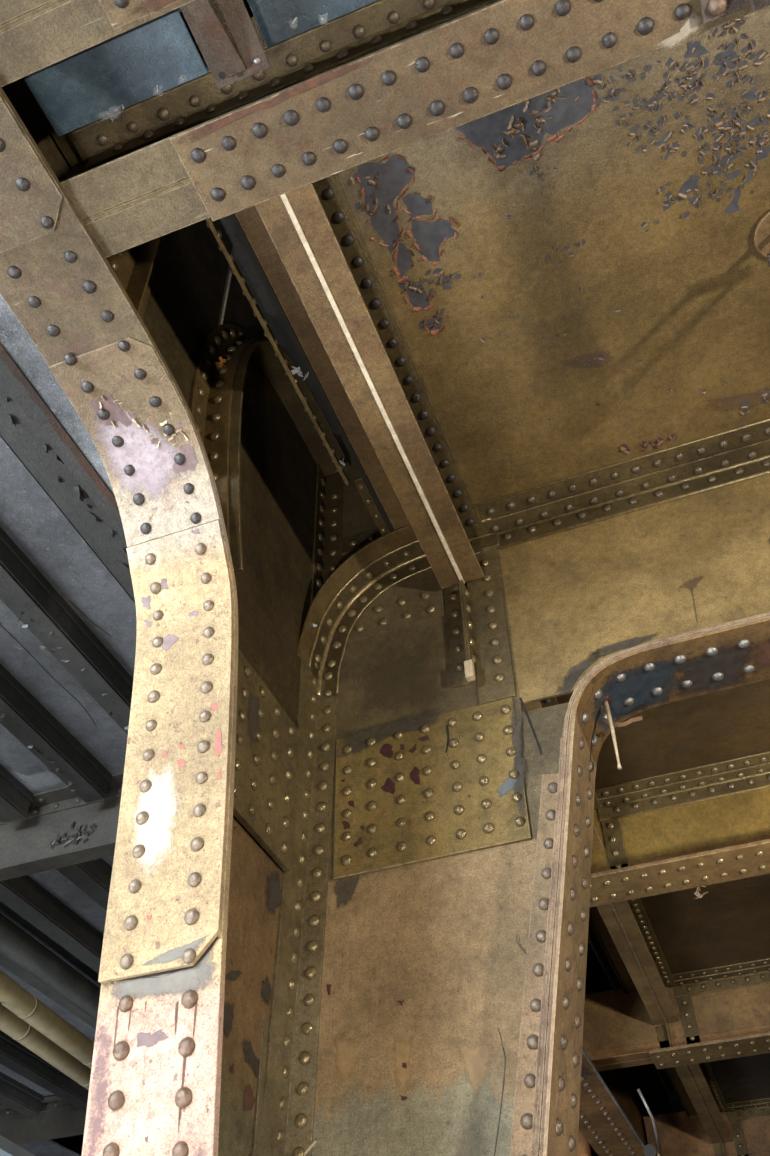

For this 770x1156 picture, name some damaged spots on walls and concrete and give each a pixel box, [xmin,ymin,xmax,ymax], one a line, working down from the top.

peeling [456,16,770,233]
peeling [350,154,483,335]
peeling [91,392,197,499]